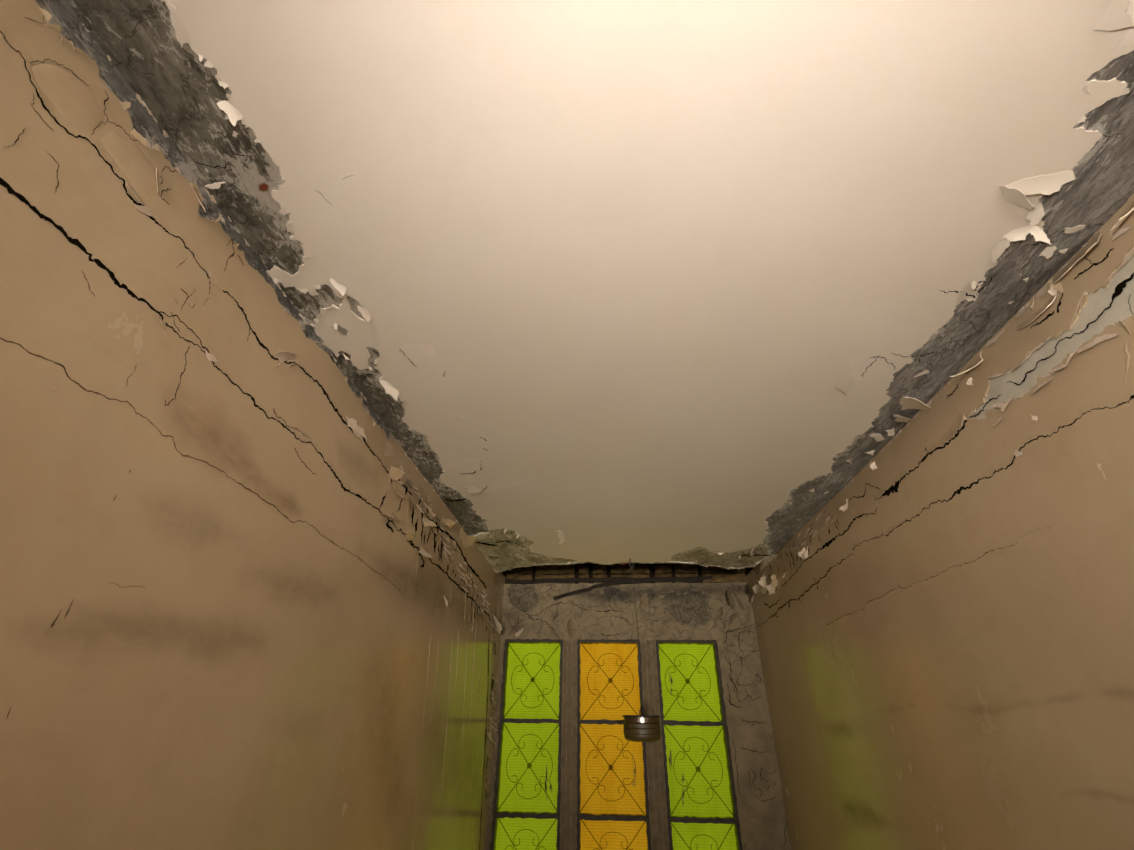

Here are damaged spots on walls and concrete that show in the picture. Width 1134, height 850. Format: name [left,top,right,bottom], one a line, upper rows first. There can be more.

crack [0,18,696,850]
spalling [35,0,1134,657]
crack [714,383,1134,802]
crack [940,281,982,298]